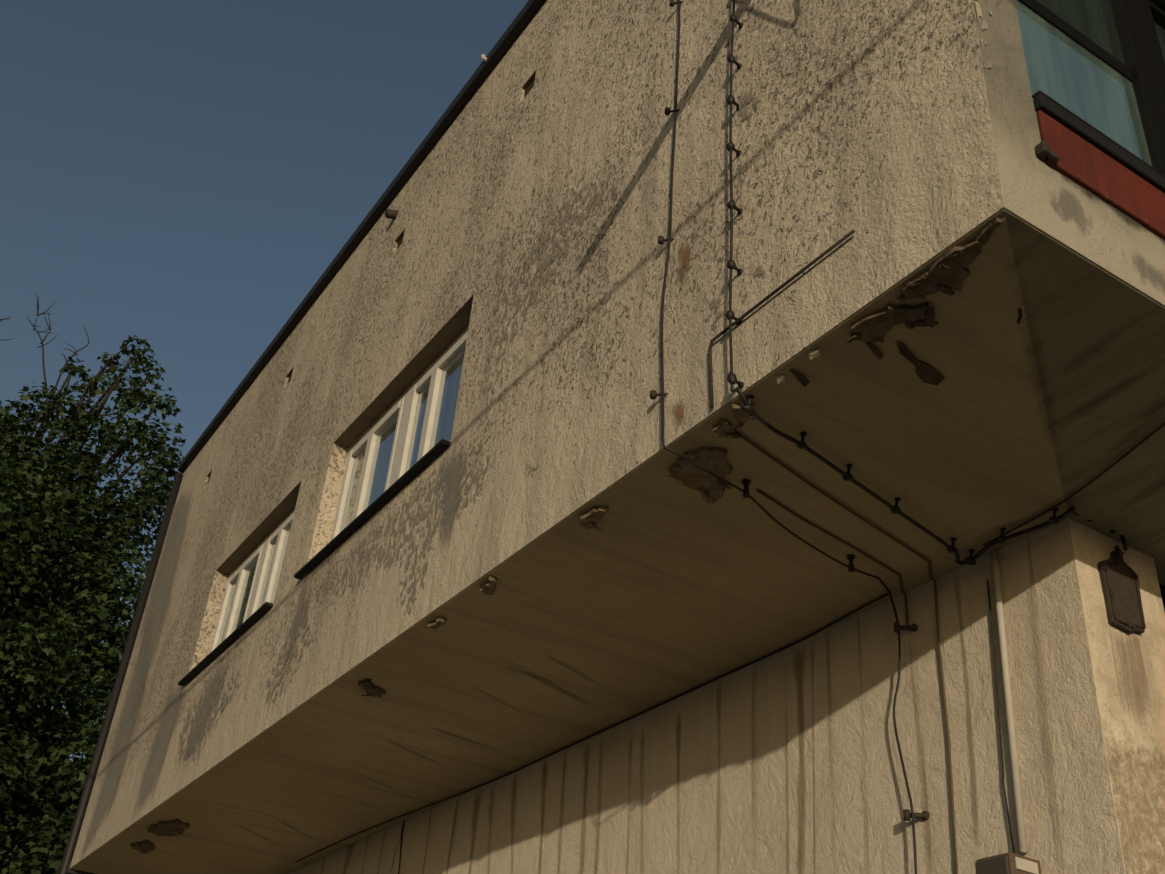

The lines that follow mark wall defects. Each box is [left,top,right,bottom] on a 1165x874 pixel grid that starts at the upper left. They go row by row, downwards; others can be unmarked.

flaking render [847,215,1006,386]
flaking render [666,401,755,504]
flaking render [265,437,494,703]
leakage [798,656,815,827]
flaking render [131,818,190,854]